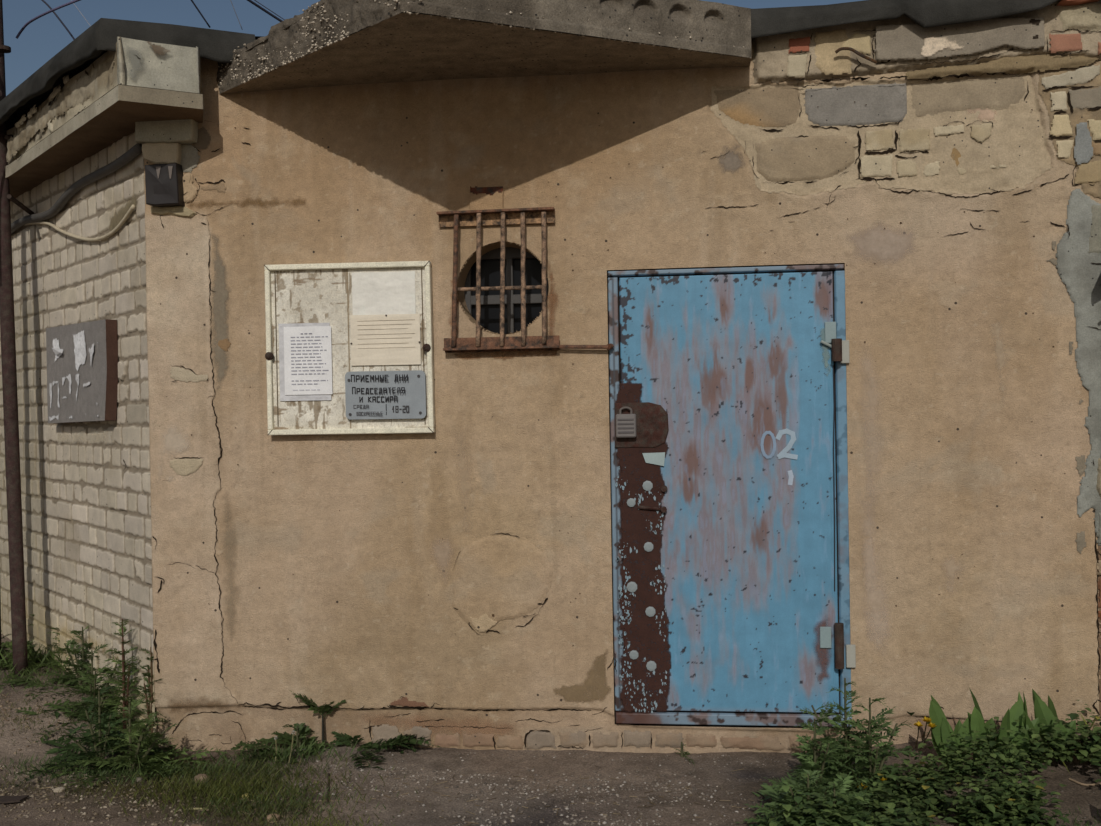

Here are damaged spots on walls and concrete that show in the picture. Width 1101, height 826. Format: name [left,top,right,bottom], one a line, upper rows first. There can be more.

flaking render [6,60,115,164]
spalling [710,33,1101,199]
rust [470,186,503,195]
rust [615,382,643,403]
crack [152,178,607,744]
rust [616,442,671,714]
rust [816,622,832,680]